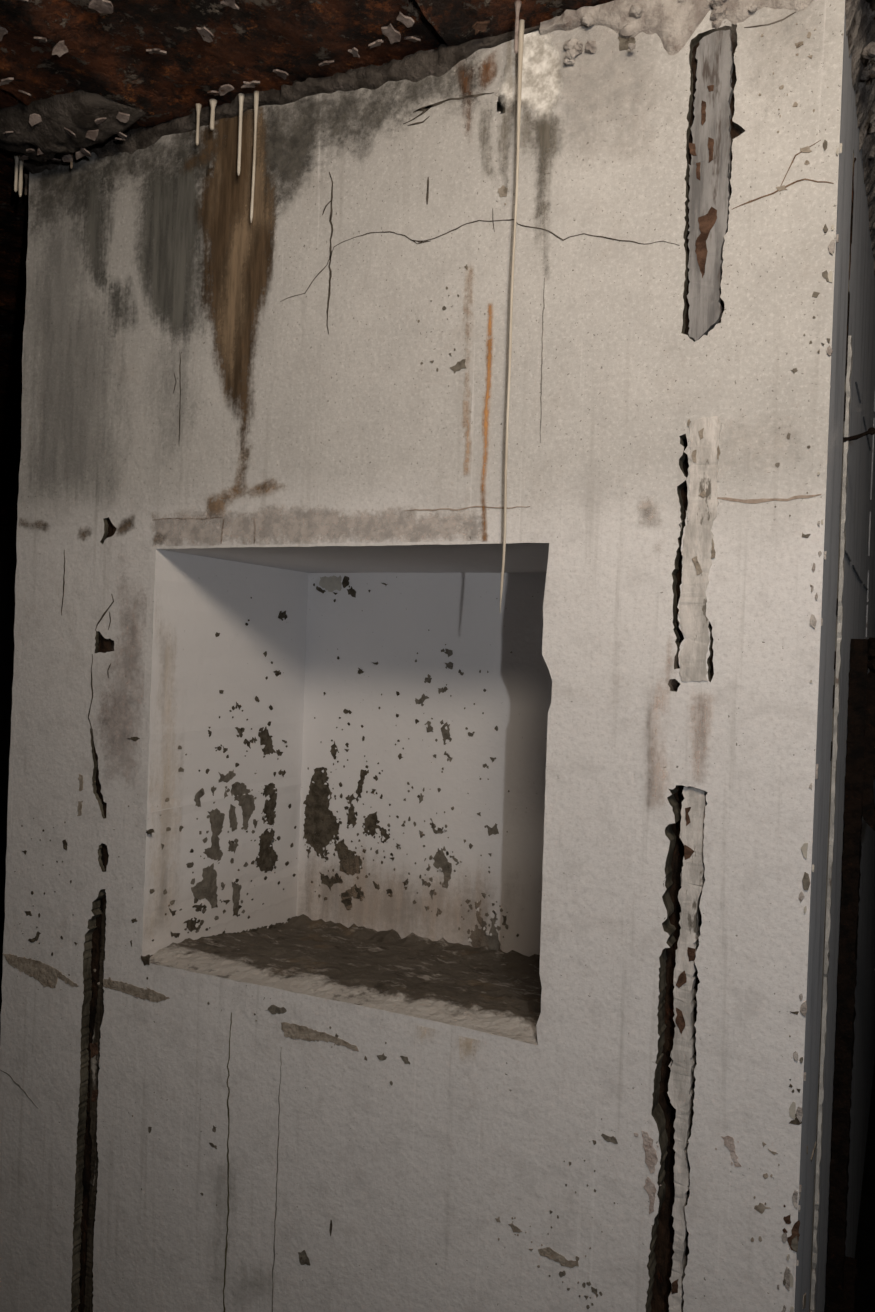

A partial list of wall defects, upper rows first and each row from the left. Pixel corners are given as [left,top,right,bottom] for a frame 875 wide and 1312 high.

spalling [23,0,816,174]
rust [458,57,496,125]
rust [689,85,714,180]
spalling [845,0,875,275]
water stain [30,57,477,451]
crack [280,172,680,334]
rust [695,207,717,278]
rust [466,305,492,541]
spalling [98,633,114,653]
peeling [146,644,492,938]
peeling [676,947,696,988]
spalling [754,1185,806,1312]